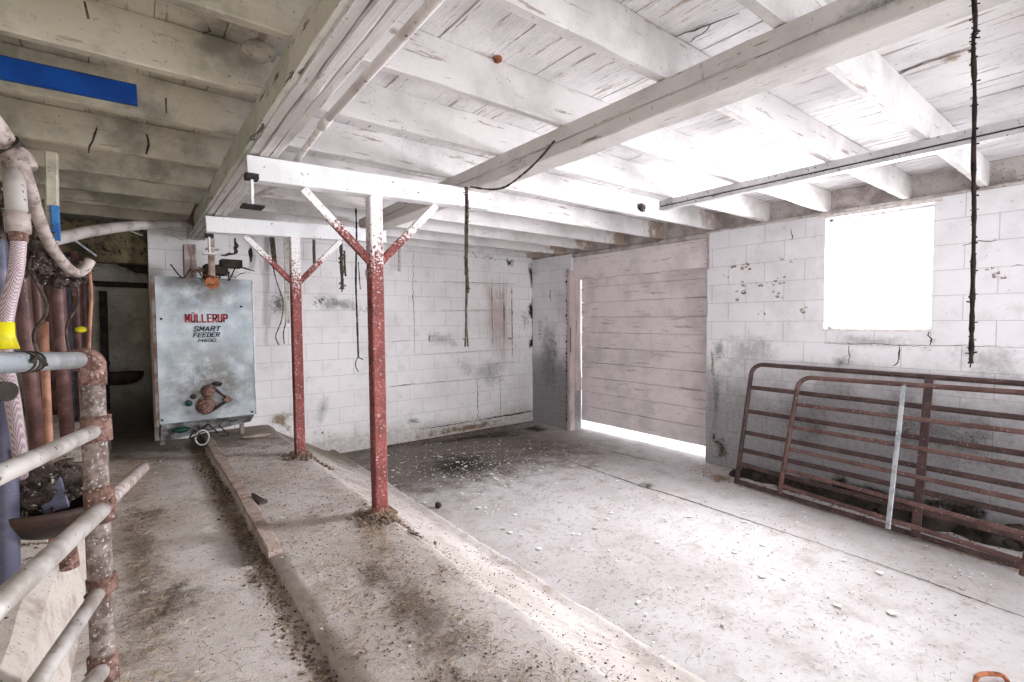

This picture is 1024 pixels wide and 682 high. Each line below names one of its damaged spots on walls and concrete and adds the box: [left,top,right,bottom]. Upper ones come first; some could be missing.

peeling [724,262,786,301]
leakage [491,288,558,371]
crack [391,253,1024,617]